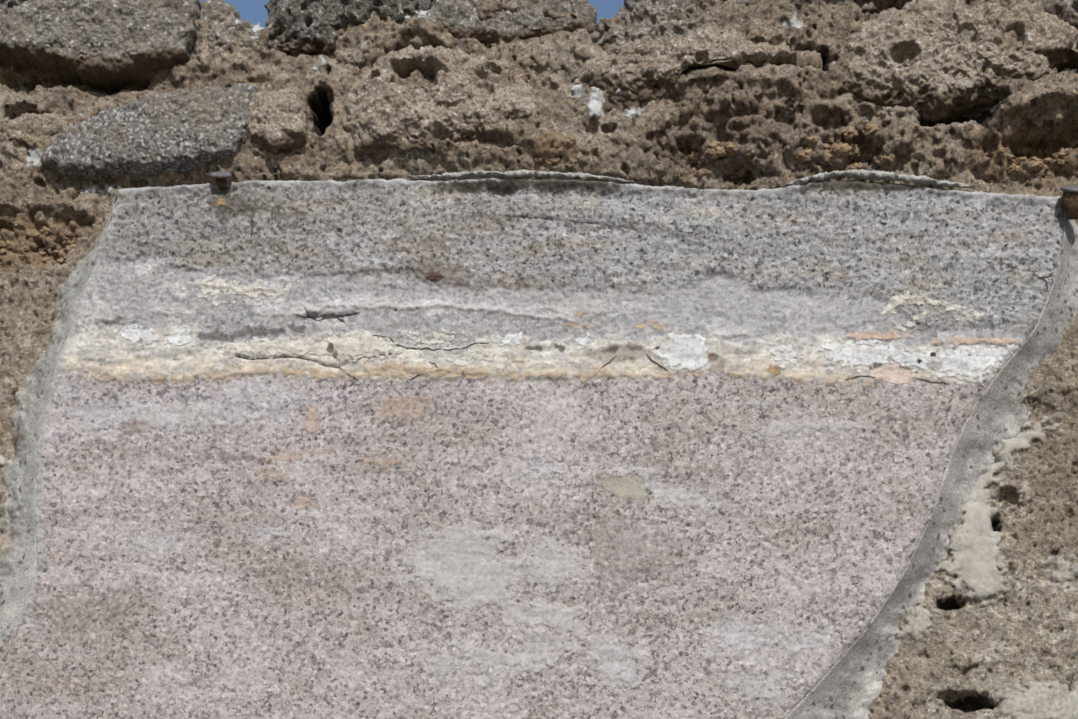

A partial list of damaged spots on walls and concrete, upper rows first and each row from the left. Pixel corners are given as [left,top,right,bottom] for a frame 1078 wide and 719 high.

corrosion [214,187,231,206]
crack [296,314,345,322]
peeling [881,292,987,332]
crack [237,335,489,380]
peeling [555,332,597,351]
peeling [631,332,718,372]
peeling [768,341,804,374]
peeling [817,335,1020,386]